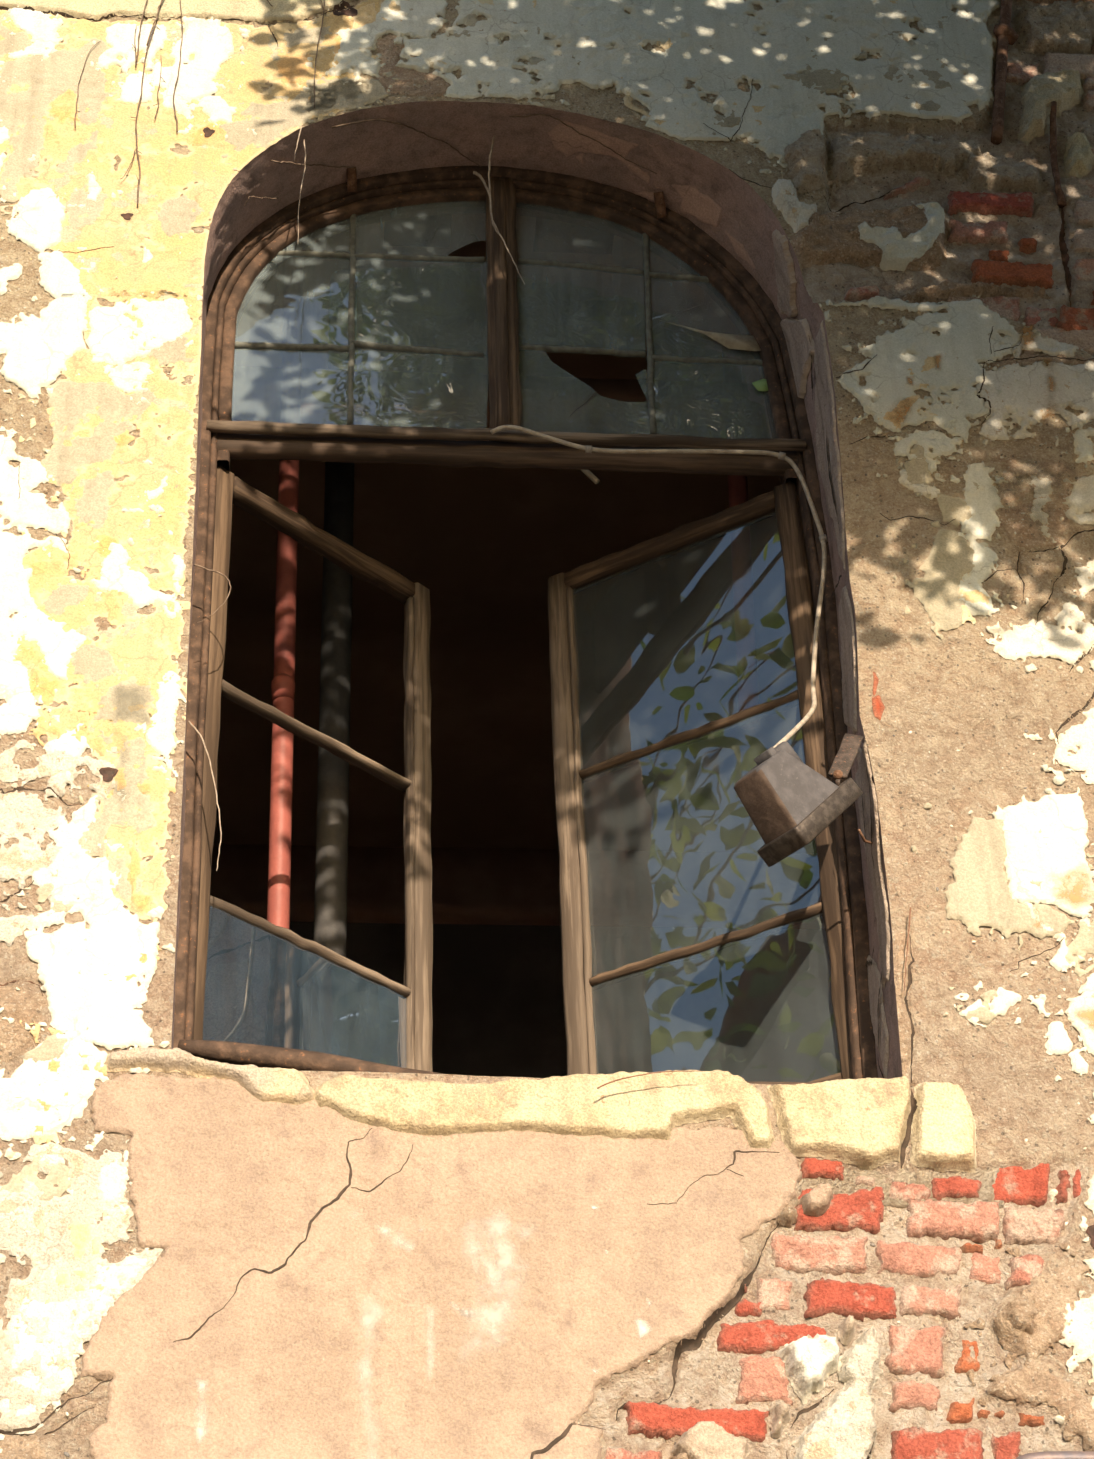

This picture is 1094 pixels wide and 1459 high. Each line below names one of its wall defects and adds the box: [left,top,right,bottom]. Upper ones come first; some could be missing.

crack [0,6,175,22]
peeling [819,250,1094,639]
peeling [0,0,1047,1143]
peeling [979,545,1094,685]
crack [0,787,82,806]
peeling [925,705,1094,1124]
crack [865,934,918,1169]
crack [0,1378,113,1435]
peeling [0,1131,164,1435]
crack [173,1128,413,1342]
crack [530,1221,780,1459]
flaking render [605,1157,1094,1459]